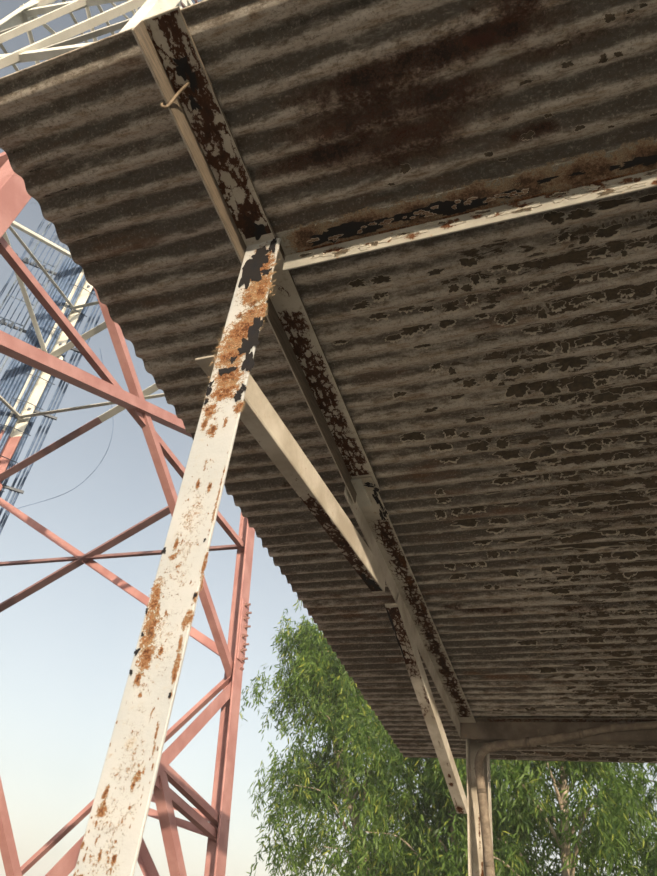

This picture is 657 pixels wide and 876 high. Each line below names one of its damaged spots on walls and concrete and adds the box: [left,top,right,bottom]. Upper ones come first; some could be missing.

rust [147,0,657,719]
peeling [348,193,657,598]
peeling [504,744,657,763]